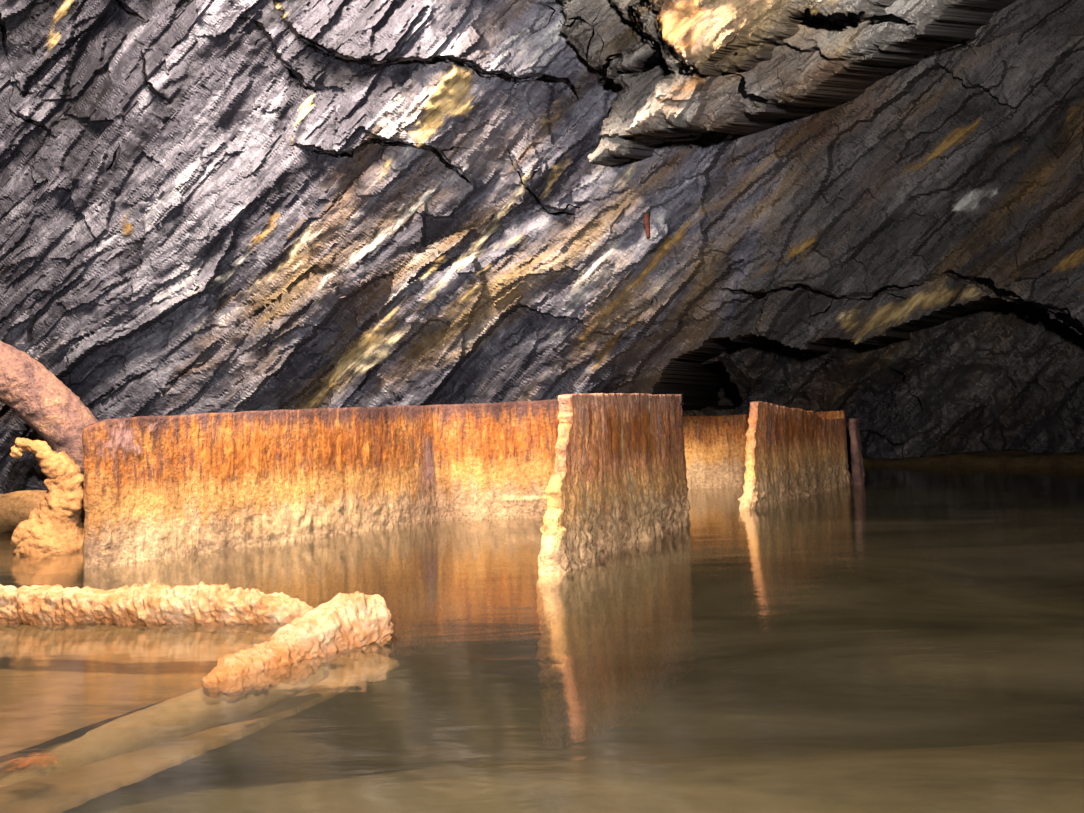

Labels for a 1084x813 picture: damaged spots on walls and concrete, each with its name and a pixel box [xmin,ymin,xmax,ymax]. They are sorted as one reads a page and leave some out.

crack [98,0,147,21]
crack [0,12,71,143]
crack [140,49,170,103]
crack [237,0,579,99]
crack [543,0,785,102]
crack [289,138,471,183]
crack [719,270,1084,336]
rust [207,422,436,512]
rust [459,419,559,470]
rust [582,398,675,467]